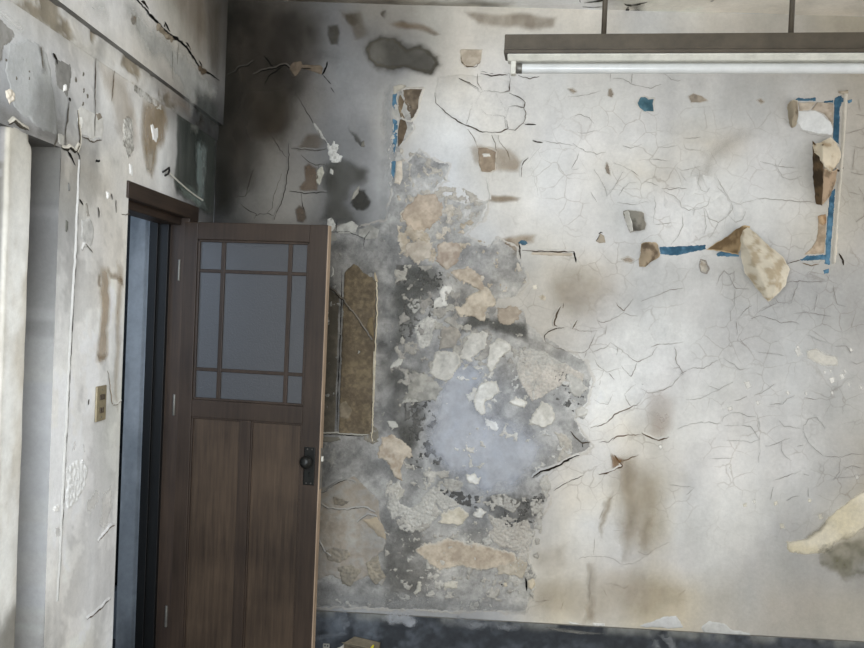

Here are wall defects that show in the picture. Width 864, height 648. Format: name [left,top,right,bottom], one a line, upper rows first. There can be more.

spalling [0,19,14,62]
crack [137,0,334,92]
water stain [329,26,339,44]
water stain [365,36,439,75]
spalling [5,89,15,104]
crack [8,116,29,131]
spalling [123,116,134,159]
water stain [312,123,370,231]
crack [519,74,810,242]
peeling [797,102,834,137]
spalling [316,84,596,616]
crack [531,271,862,500]